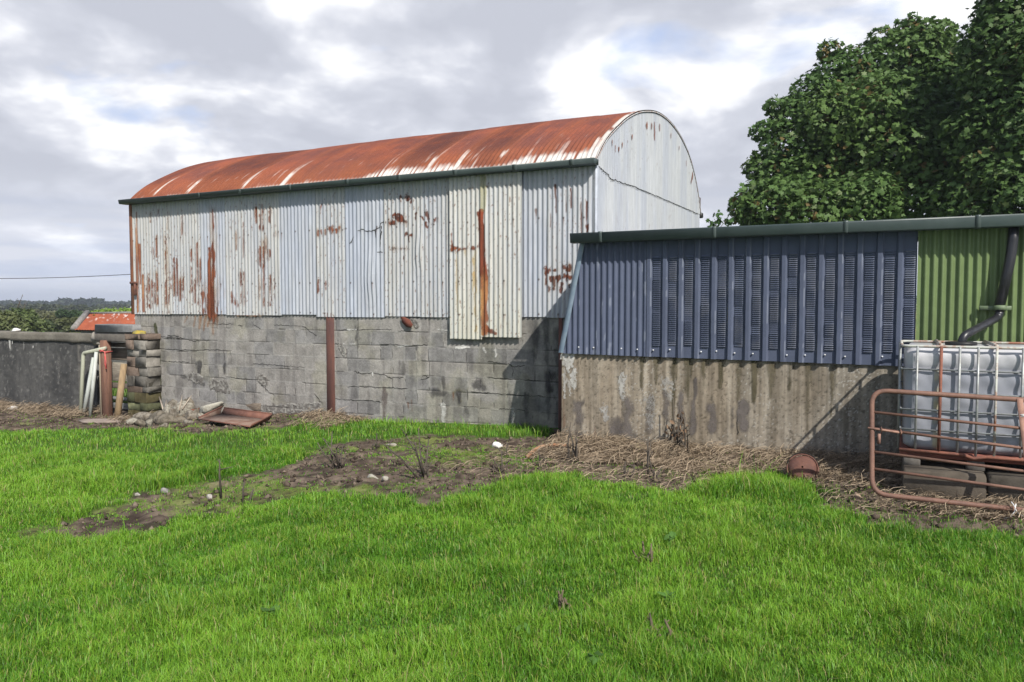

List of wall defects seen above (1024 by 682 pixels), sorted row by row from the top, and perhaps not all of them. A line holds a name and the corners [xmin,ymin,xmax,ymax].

corrosion [135,212,218,330]
corrosion [231,207,275,316]
corrosion [451,209,497,336]
leakage [639,356,717,435]
leakage [732,360,775,431]